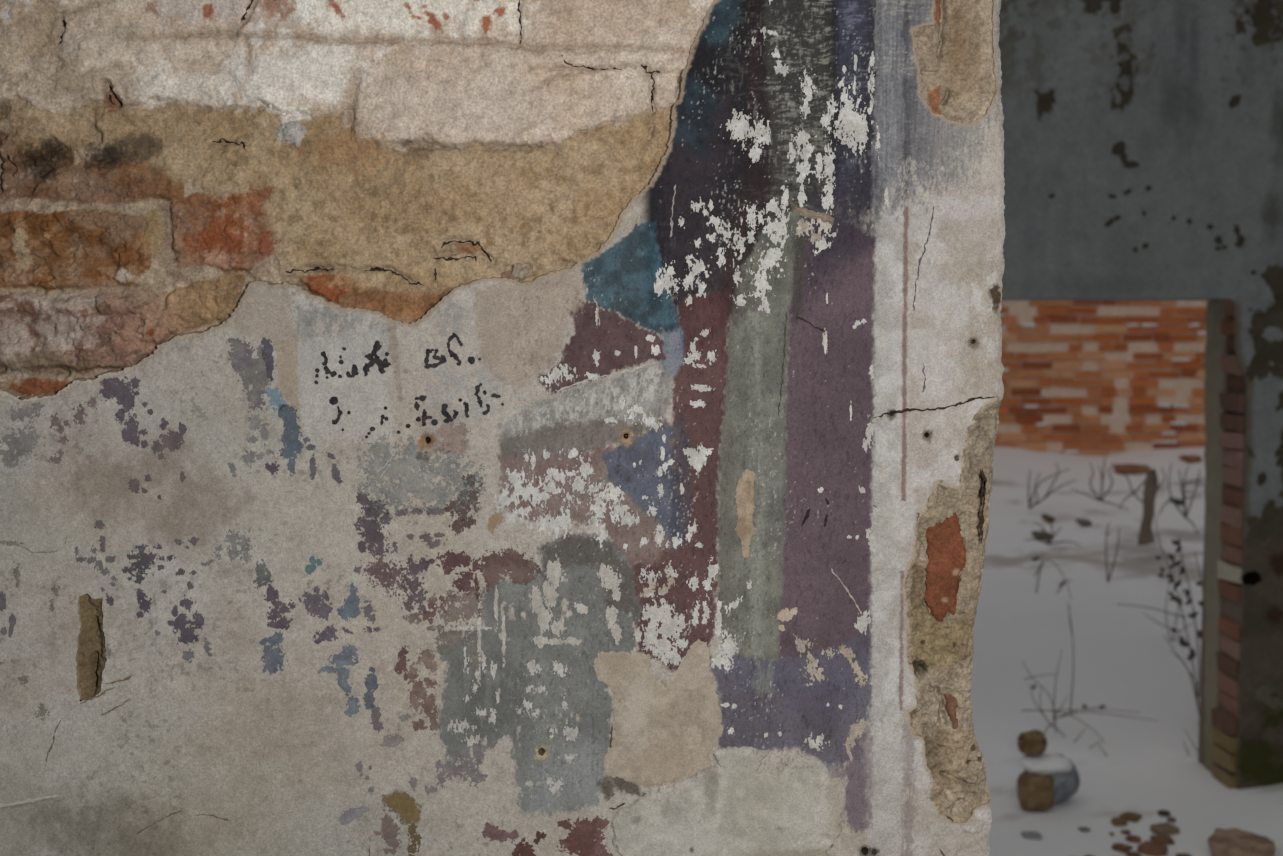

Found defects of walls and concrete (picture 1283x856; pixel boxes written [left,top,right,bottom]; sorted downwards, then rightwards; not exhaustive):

crack [108,86,122,105]
crack [212,138,246,149]
crack [561,55,660,113]
flaking render [913,0,996,124]
flaking render [0,0,716,480]
crack [913,207,934,310]
crack [874,364,994,418]
peeling [1245,265,1283,411]
spalling [75,529,271,704]
flaking render [354,397,752,789]
flaking render [904,397,1002,823]
peeling [1239,428,1283,790]